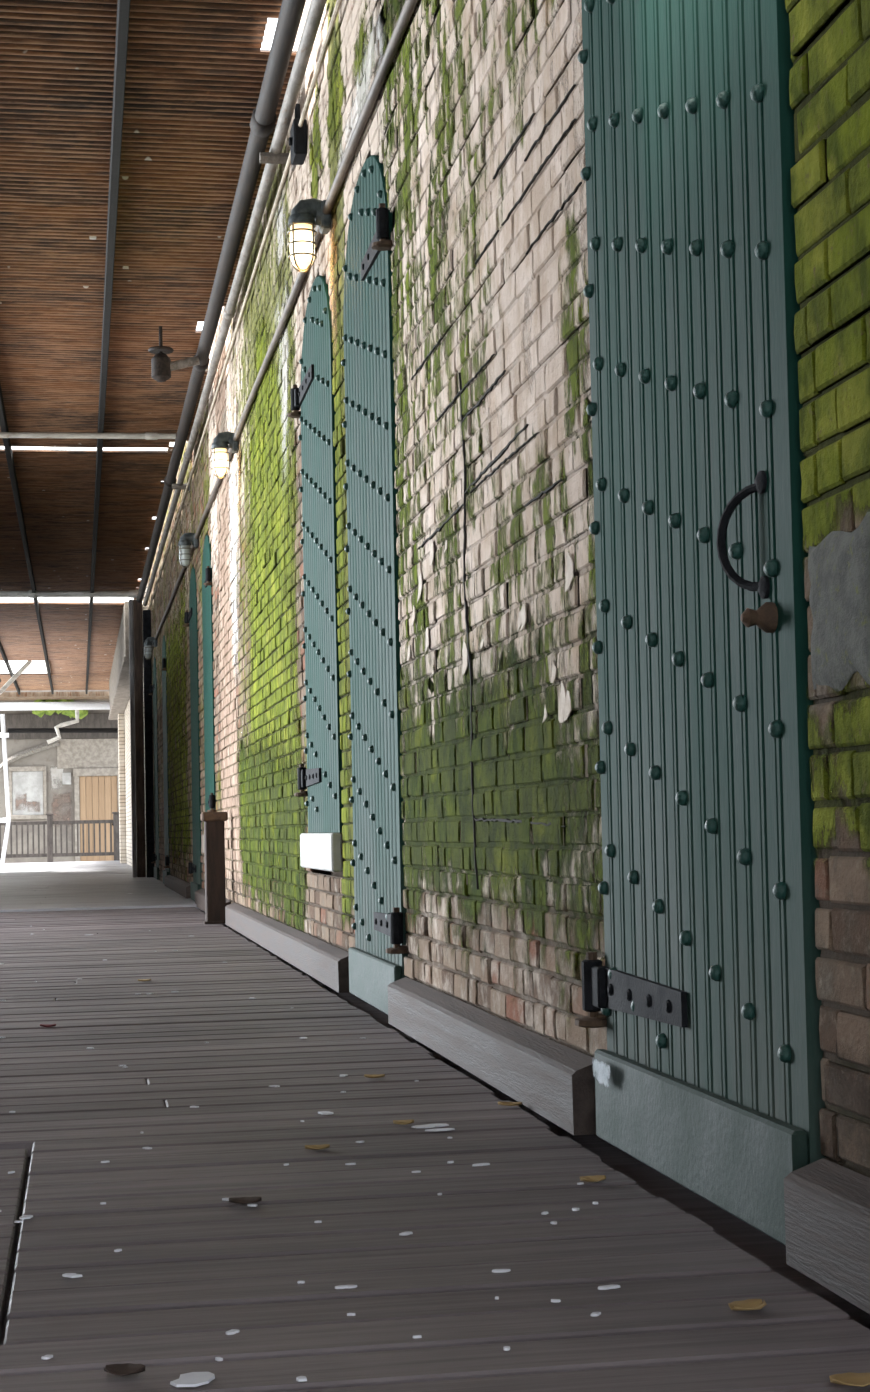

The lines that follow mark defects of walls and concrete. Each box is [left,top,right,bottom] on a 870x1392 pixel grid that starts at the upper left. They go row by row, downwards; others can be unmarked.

water stain [277,215,285,261]
water stain [278,312,288,446]
peeling [388,0,593,723]